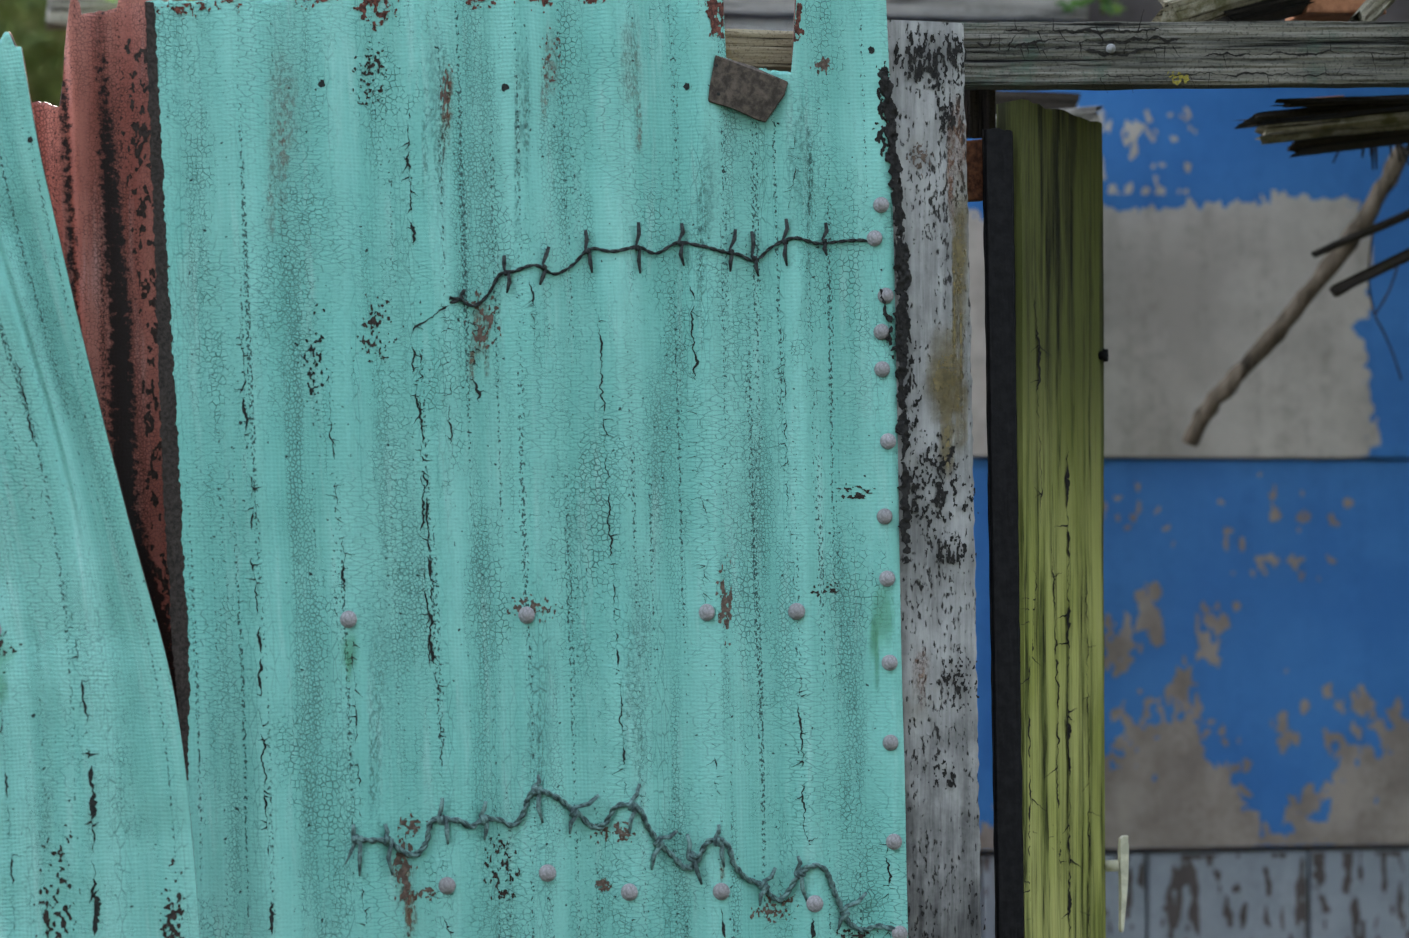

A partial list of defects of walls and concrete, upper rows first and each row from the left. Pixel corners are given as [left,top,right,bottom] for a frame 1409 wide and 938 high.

peeling [1097,107,1197,160]
peeling [903,209,988,571]
peeling [1103,159,1381,532]
peeling [1223,527,1320,581]
peeling [1104,581,1165,678]
peeling [1105,600,1409,938]
rust [401,867,416,936]
peeling [960,822,994,938]